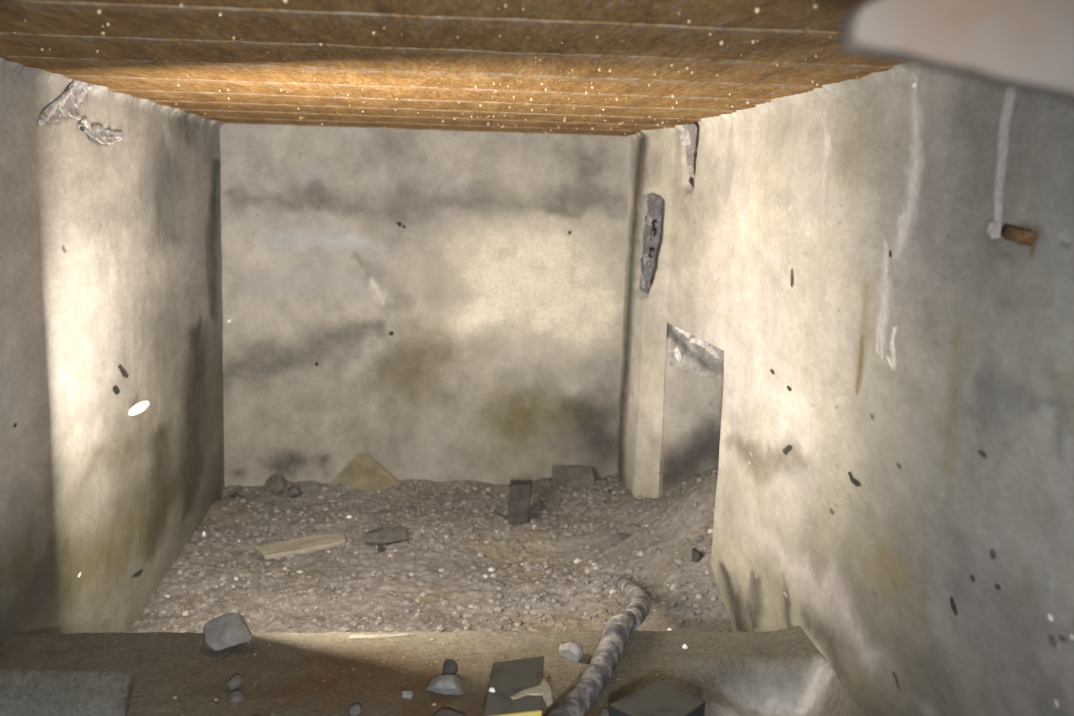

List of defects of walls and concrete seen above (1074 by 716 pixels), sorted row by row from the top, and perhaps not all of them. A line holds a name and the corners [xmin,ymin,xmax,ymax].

spalling [39,80,123,145]
spalling [639,194,662,295]
water stain [876,77,921,369]